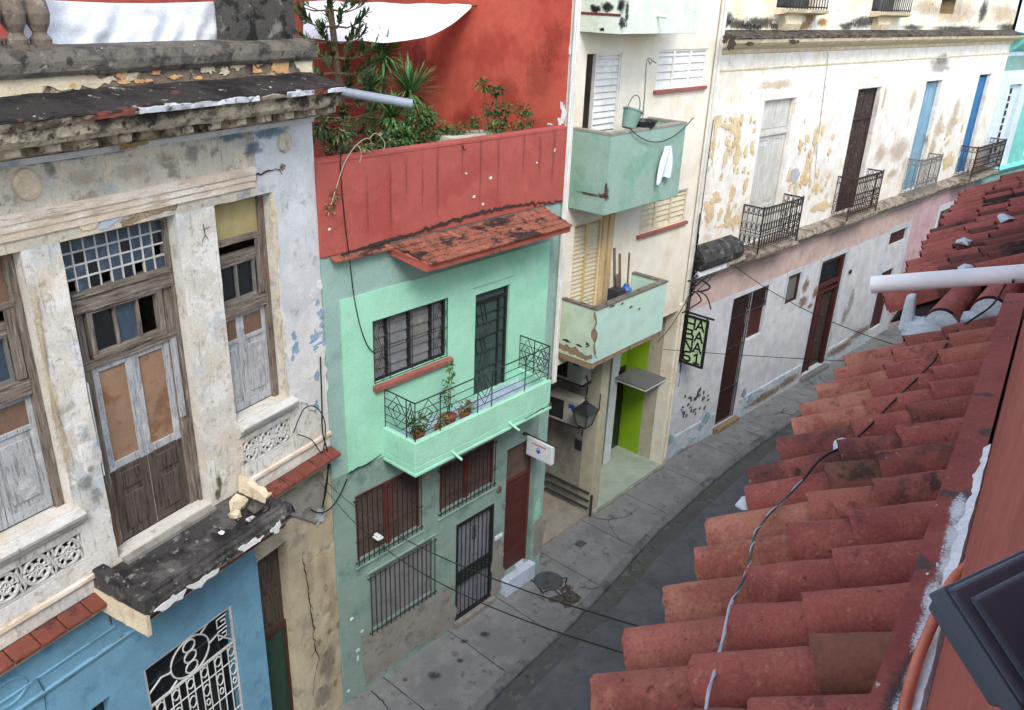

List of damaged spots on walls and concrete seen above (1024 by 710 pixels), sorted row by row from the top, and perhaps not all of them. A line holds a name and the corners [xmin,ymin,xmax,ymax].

mould [591,0,629,28]
mould [726,12,778,30]
leakage [800,15,827,29]
leakage [841,17,873,30]
leakage [937,1,988,30]
peeling [0,61,313,97]
peeling [703,114,756,231]
corrosion [577,184,609,200]
peeling [269,197,328,419]
peeling [238,521,282,552]
peeling [154,568,219,612]
crack [302,558,319,690]